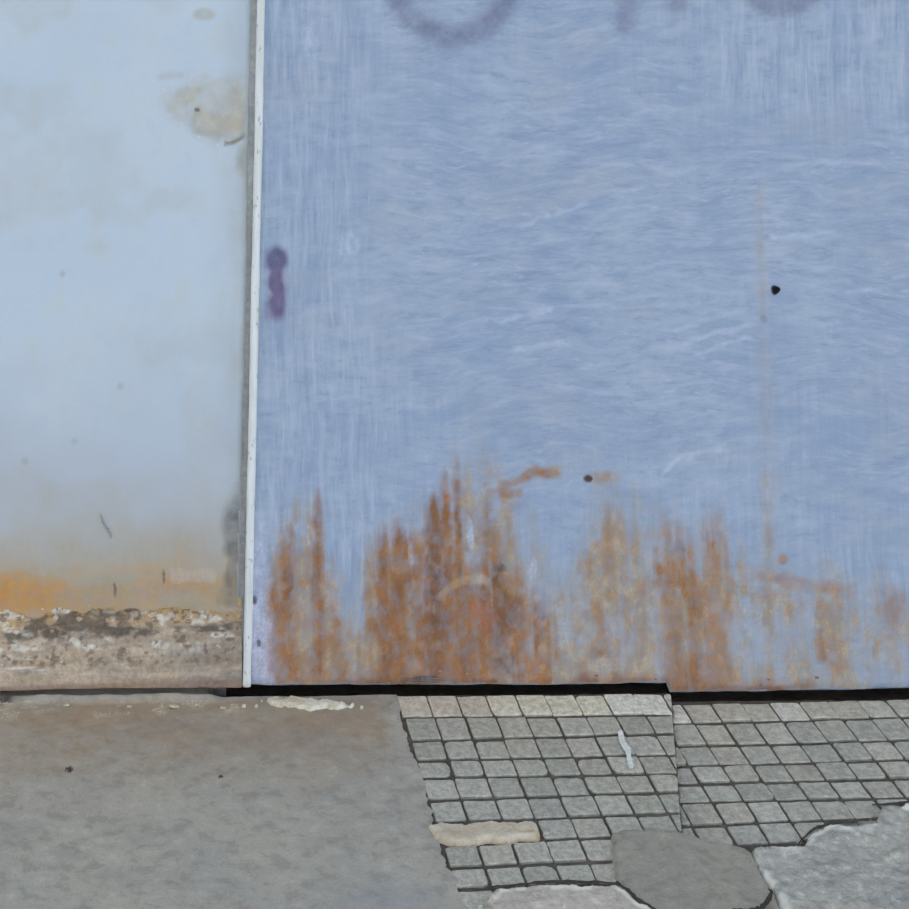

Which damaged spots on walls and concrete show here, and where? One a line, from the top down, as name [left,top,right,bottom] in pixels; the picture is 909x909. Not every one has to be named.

rust [0,168,909,821]
spalling [0,506,278,719]
spalling [218,695,363,717]